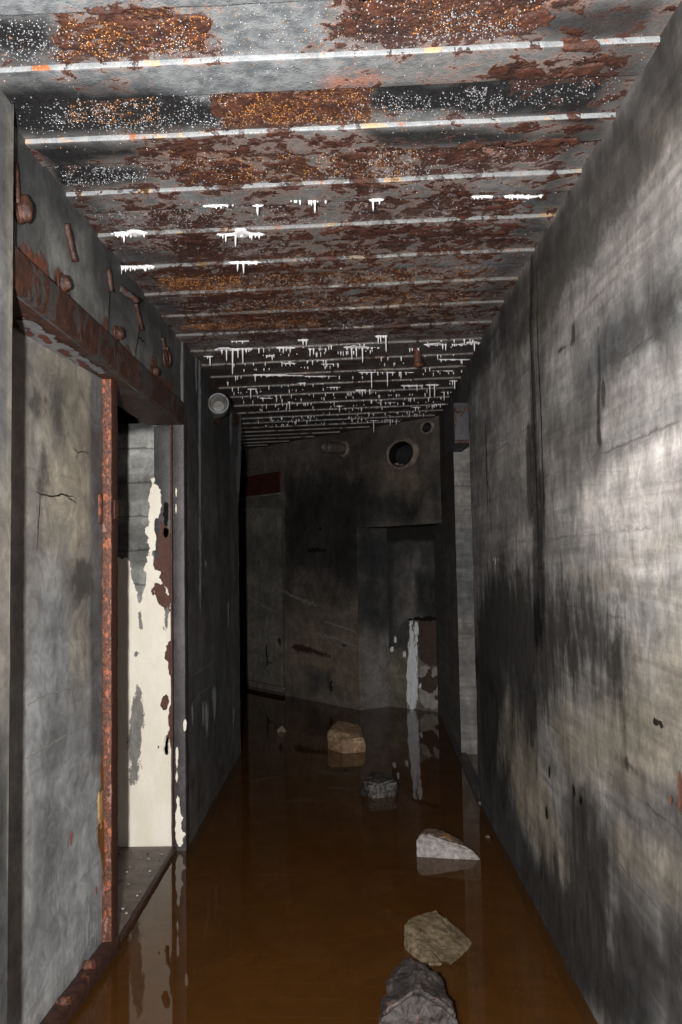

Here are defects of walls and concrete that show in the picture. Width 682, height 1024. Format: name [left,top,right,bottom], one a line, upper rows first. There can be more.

corrosion [54,1,216,60]
corrosion [343,0,412,35]
corrosion [493,0,556,33]
corrosion [209,90,364,128]
corrosion [176,152,378,187]
corrosion [291,226,383,240]
corrosion [399,189,552,239]
crack [35,491,74,553]
water stain [475,257,622,804]
peeling [117,477,187,847]
peeling [418,664,438,710]
water stain [521,793,632,1024]